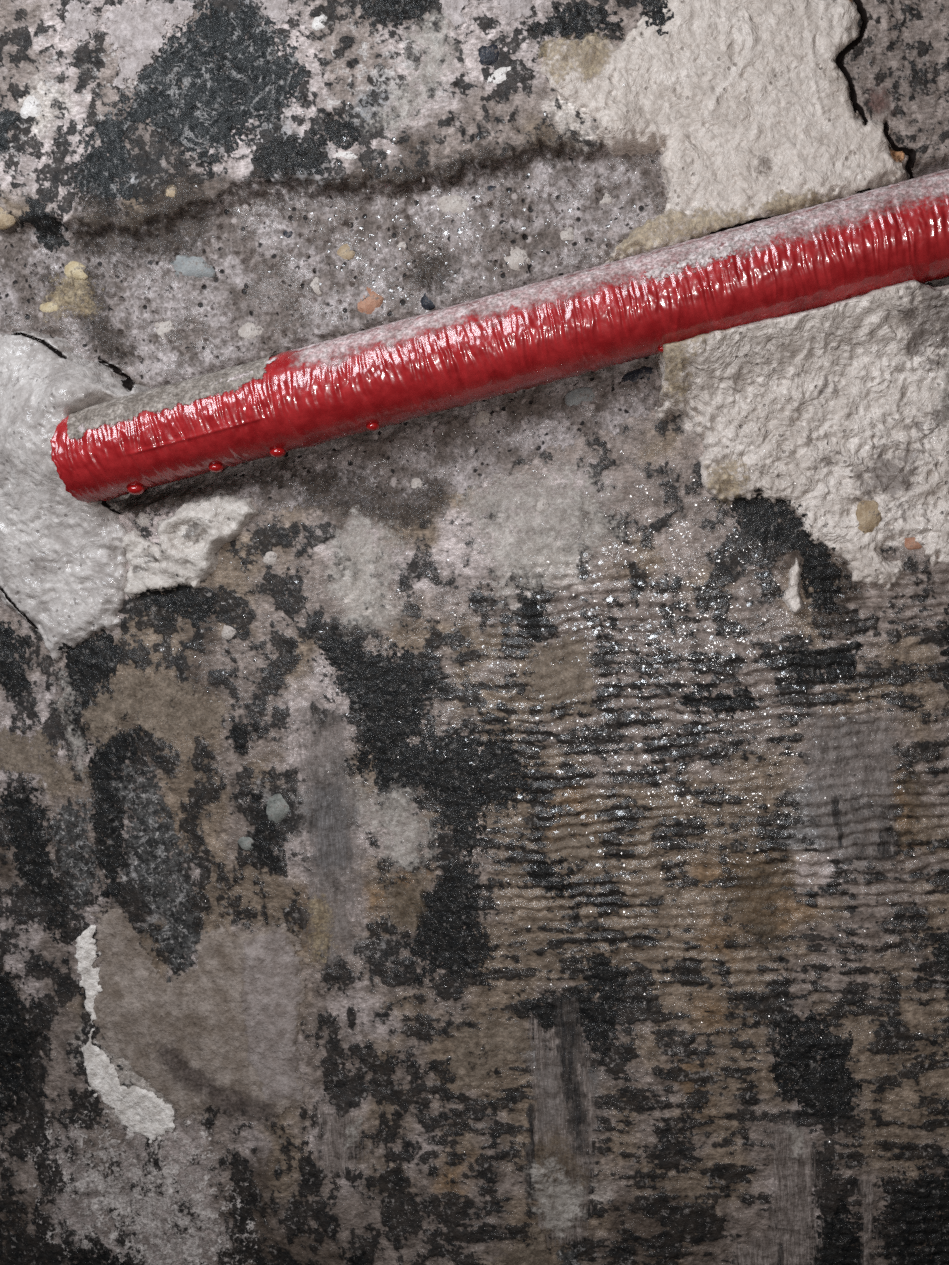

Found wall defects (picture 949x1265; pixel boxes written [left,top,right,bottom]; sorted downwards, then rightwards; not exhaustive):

water stain [20,0,590,365]
water stain [640,0,674,36]
crack [690,215,779,240]
crack [836,0,916,194]
crack [0,587,38,629]
water stain [0,620,207,983]
water stain [114,466,543,987]
water stain [716,487,864,683]
water stain [24,1108,257,1265]
flaking render [75,906,309,1144]
water stain [513,949,629,1265]
water stain [733,1005,949,1265]